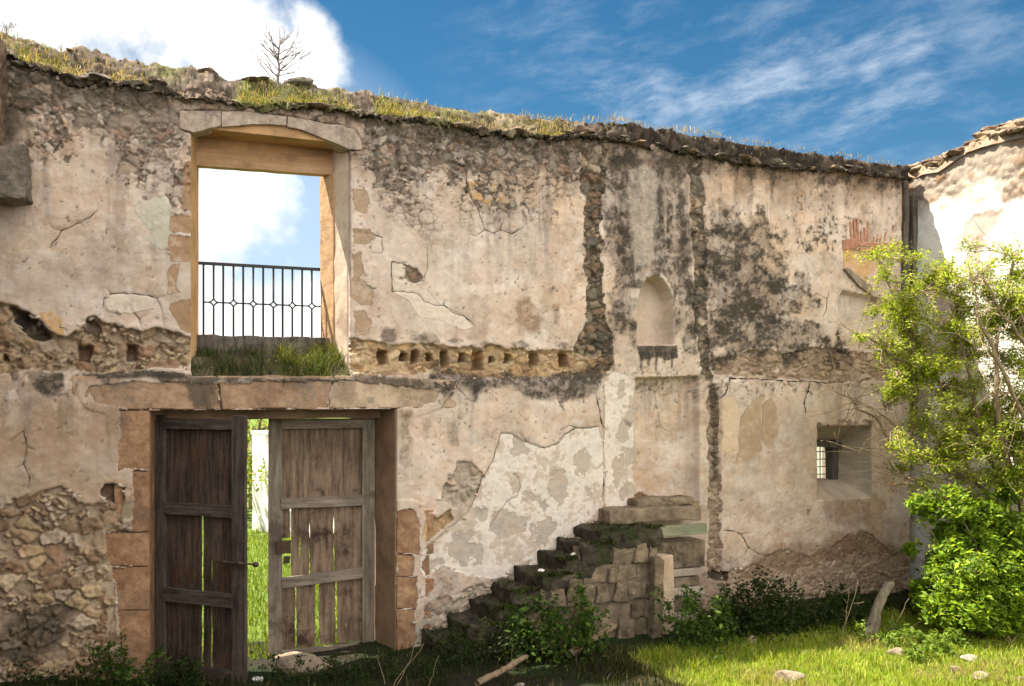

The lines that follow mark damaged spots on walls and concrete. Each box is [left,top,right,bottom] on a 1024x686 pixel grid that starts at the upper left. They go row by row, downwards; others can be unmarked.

spalling [0,59,191,374]
crack [366,234,474,325]
flaking render [350,116,650,647]
crack [472,397,603,505]
damp [600,146,861,374]
spalling [687,154,911,610]
spalling [0,483,135,682]